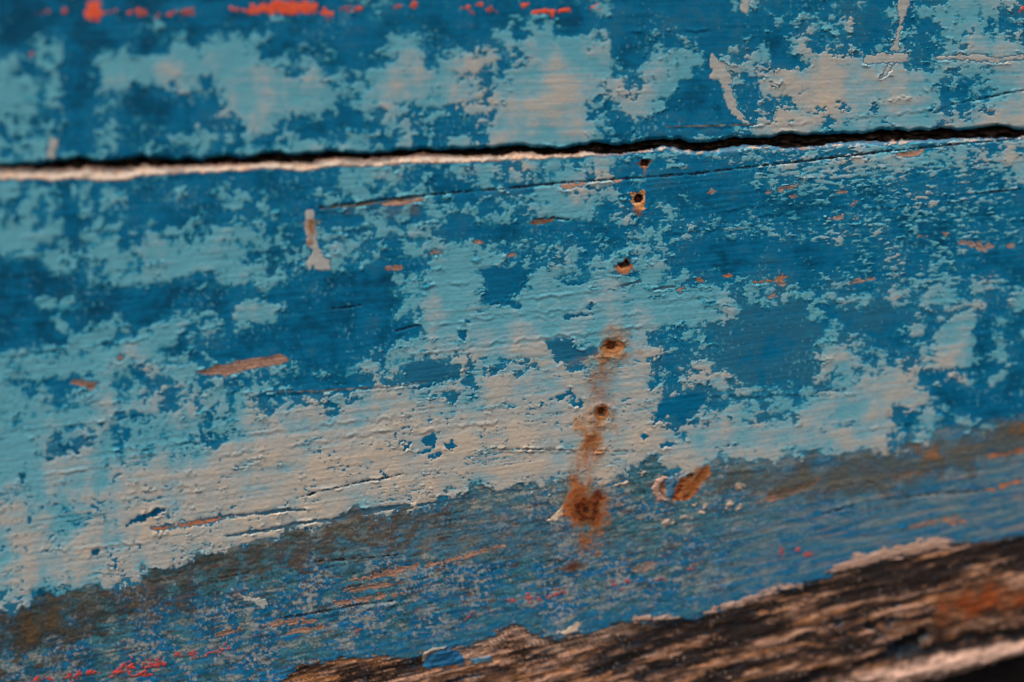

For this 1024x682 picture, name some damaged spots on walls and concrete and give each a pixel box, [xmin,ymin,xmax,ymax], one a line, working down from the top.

peeling [585,0,614,19]
peeling [0,33,68,164]
peeling [58,13,707,160]
crack [665,121,771,129]
peeling [719,0,1024,137]
crack [319,138,1022,210]
peeling [0,136,1024,614]
rust [595,326,628,390]
rust [574,405,612,457]
rust [684,466,709,493]
rust [563,480,610,554]
peeling [632,614,681,623]